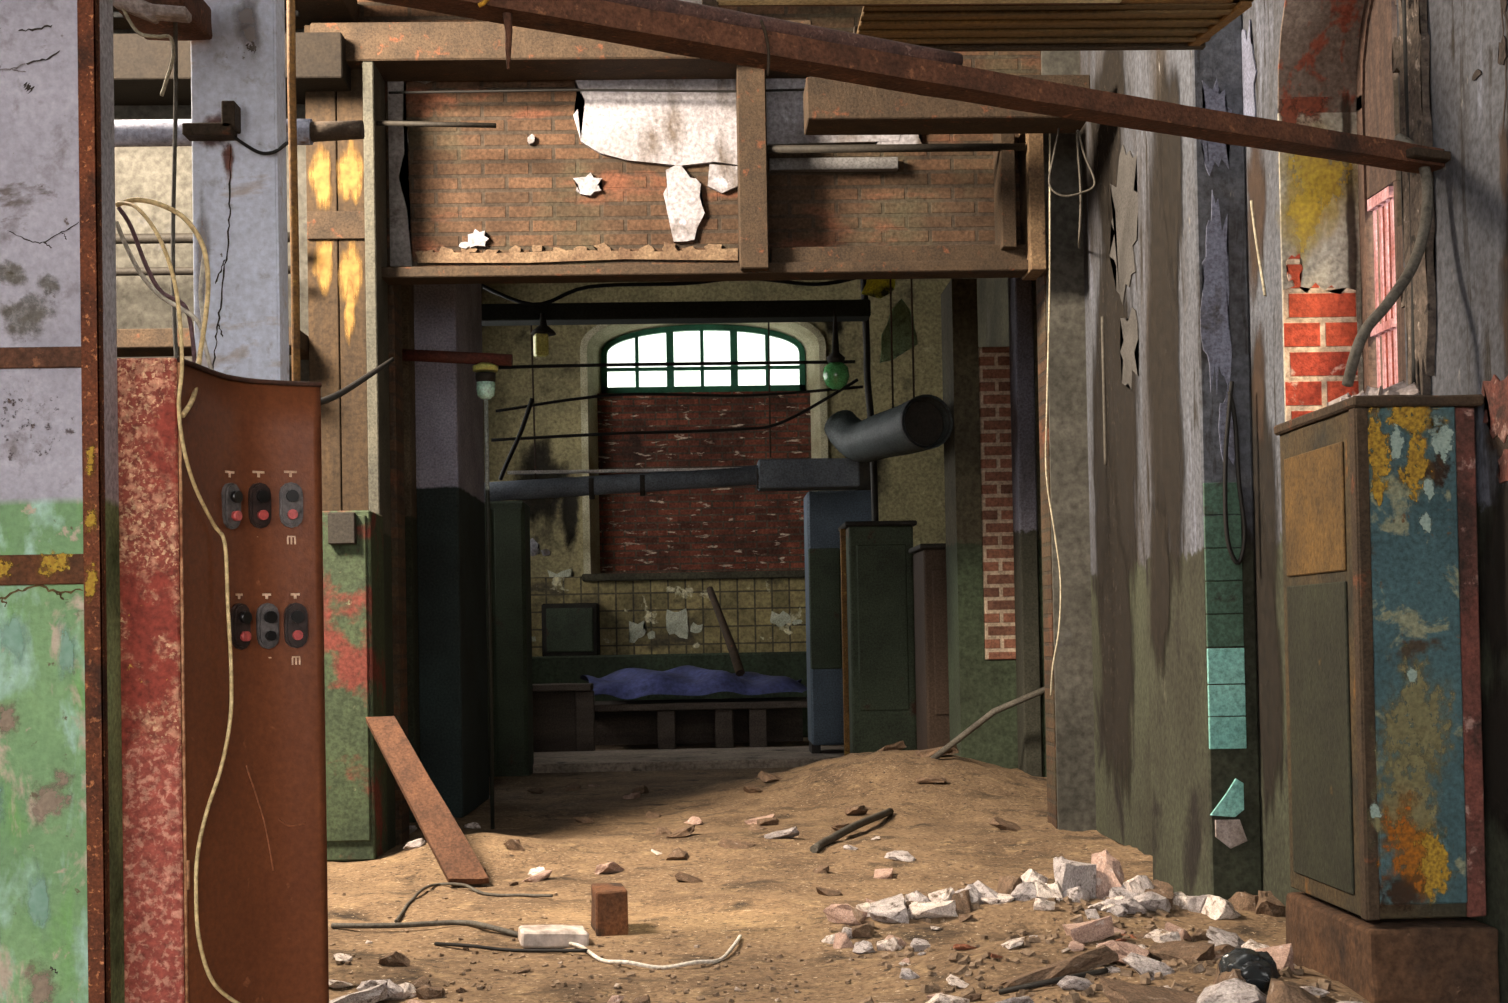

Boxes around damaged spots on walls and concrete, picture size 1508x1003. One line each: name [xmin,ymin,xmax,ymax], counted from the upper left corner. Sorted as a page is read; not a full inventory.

crack [0,25,60,72]
leakage [1095,50,1125,94]
rust [1280,97,1332,124]
rust [204,141,234,176]
rust [309,145,363,207]
peeling [388,79,738,267]
leakage [1247,148,1265,294]
leakage [0,262,59,334]
flaking render [1283,253,1359,421]
leakage [1091,122,1184,795]
peeling [629,609,703,643]
peeling [770,611,802,627]